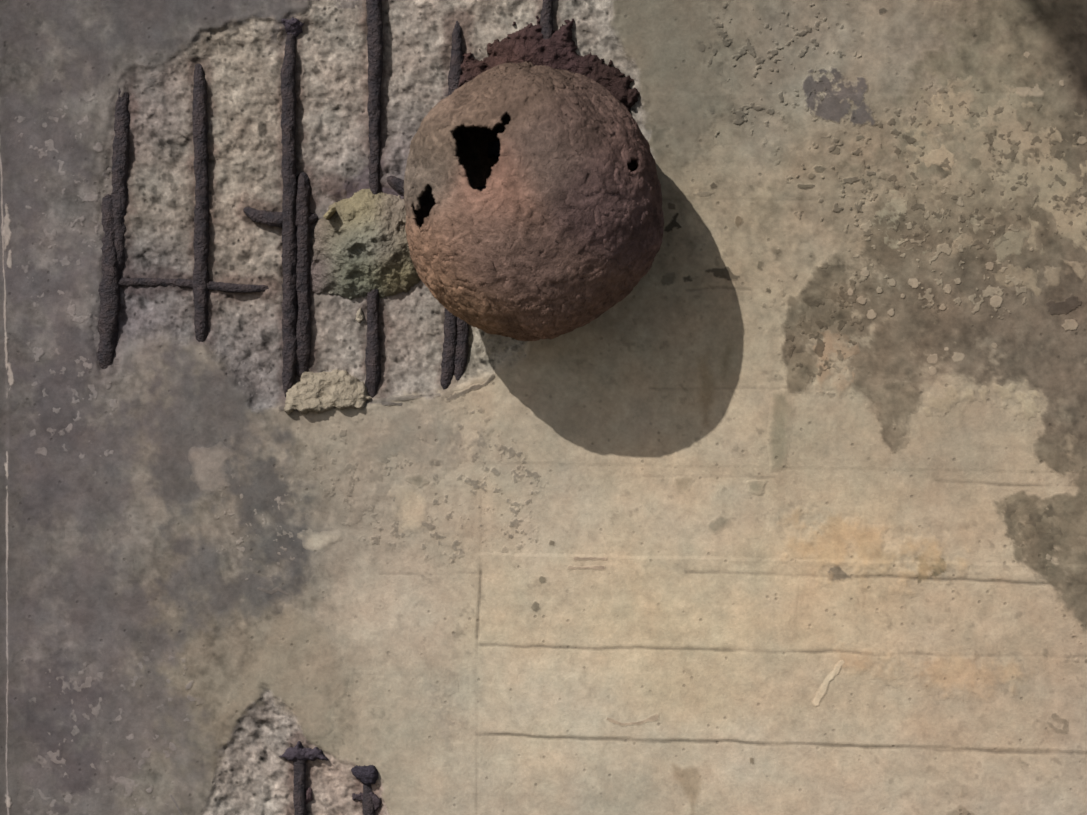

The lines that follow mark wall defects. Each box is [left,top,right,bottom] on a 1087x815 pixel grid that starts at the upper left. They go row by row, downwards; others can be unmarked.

corrosion [281,17,305,37]
spalling [630,100,662,174]
corrosion [327,145,404,200]
water stain [859,75,1087,297]
spalling [89,0,619,566]
corrosion [435,380,464,410]
water stain [922,380,1048,429]
spalling [194,692,400,815]
corrosion [278,741,328,761]
corrosion [351,765,381,811]